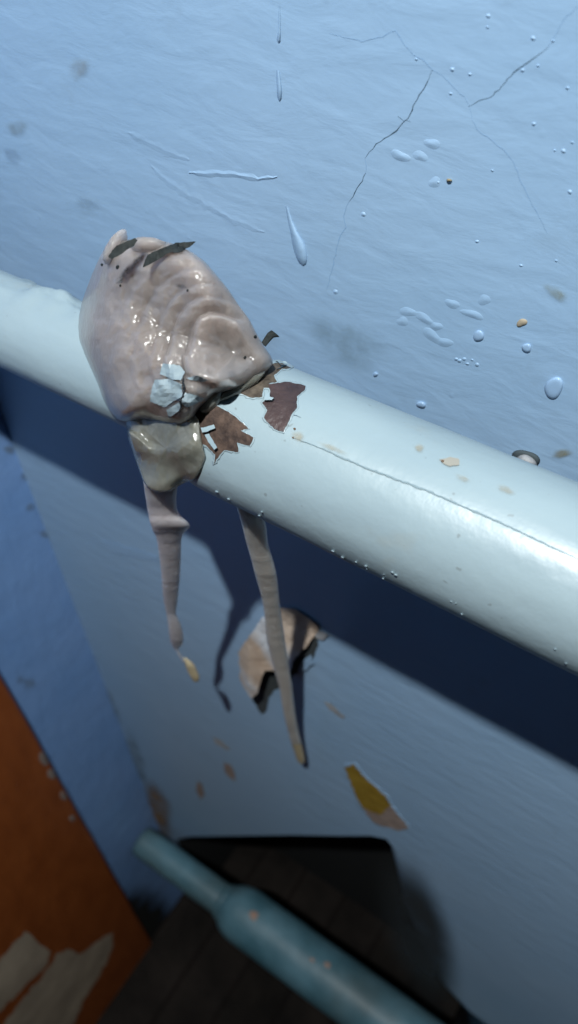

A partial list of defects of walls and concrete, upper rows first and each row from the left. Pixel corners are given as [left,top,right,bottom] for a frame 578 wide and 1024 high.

crack [327,7,577,287]
peeling [150,363,255,465]
peeling [238,360,307,434]
spalling [238,617,279,714]
spalling [280,608,328,678]
peeling [343,763,410,831]
peeling [0,931,113,1024]